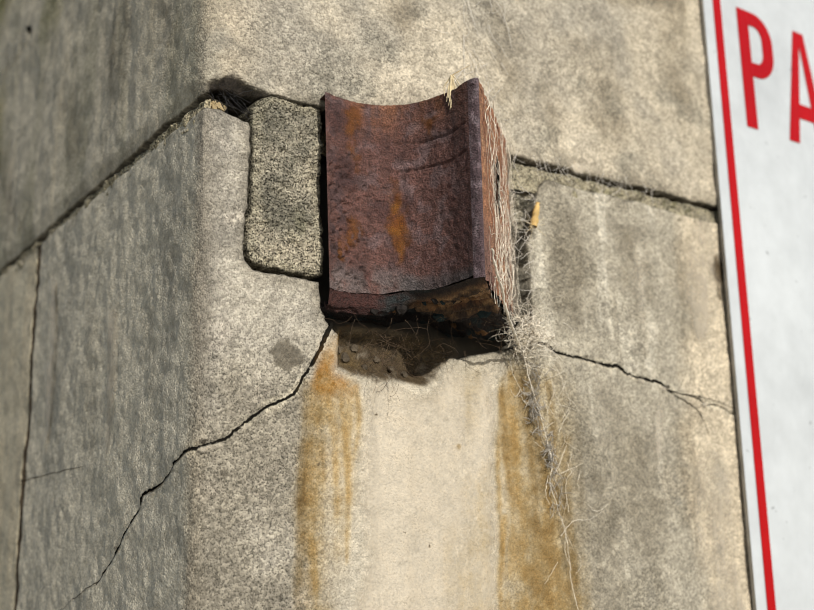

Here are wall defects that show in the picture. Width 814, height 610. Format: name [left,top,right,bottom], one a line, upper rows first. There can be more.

corrosion [314,351,347,393]
crack [538,341,735,432]
crack [65,322,333,607]